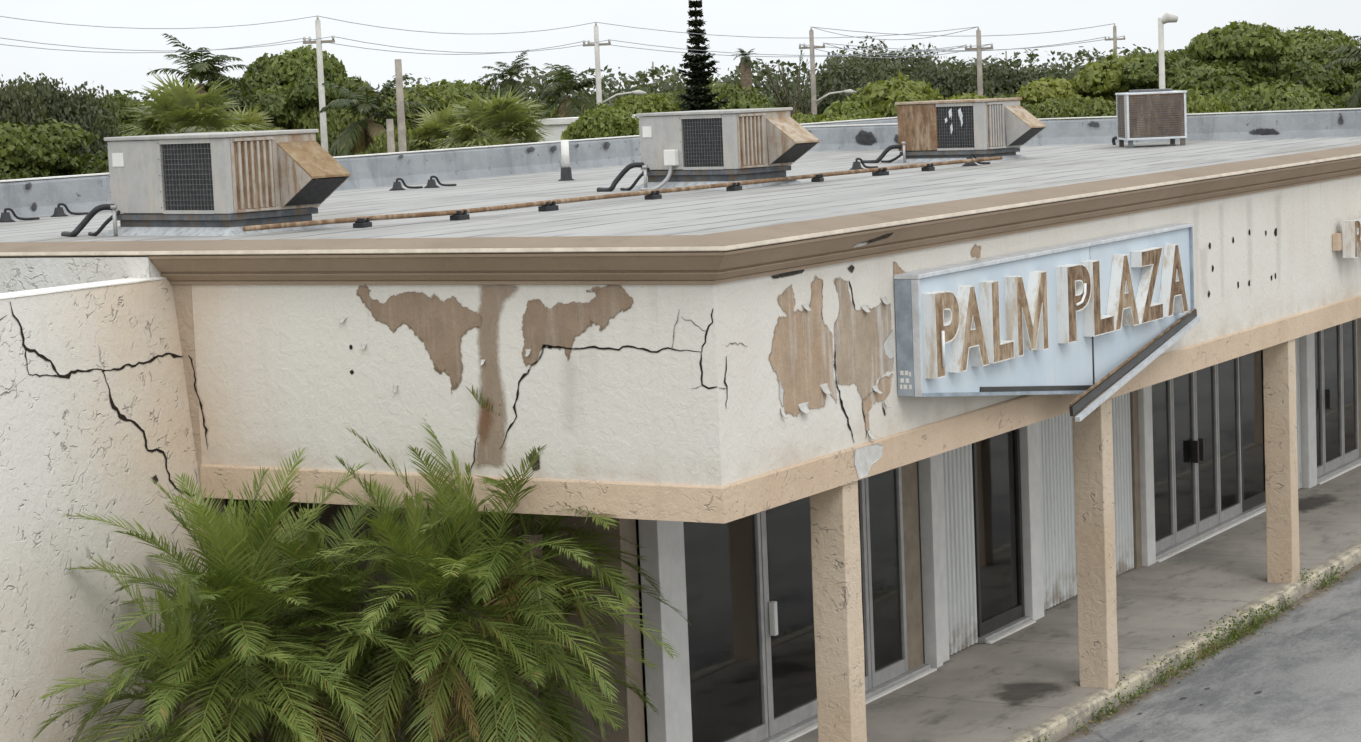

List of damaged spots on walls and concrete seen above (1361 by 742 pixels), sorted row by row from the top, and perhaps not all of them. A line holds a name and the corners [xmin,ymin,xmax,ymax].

peeling [853,233,893,248]
crack [0,301,208,534]
peeling [356,285,482,393]
peeling [521,285,633,367]
crack [470,309,748,471]
peeling [769,265,895,479]
crack [821,281,886,443]